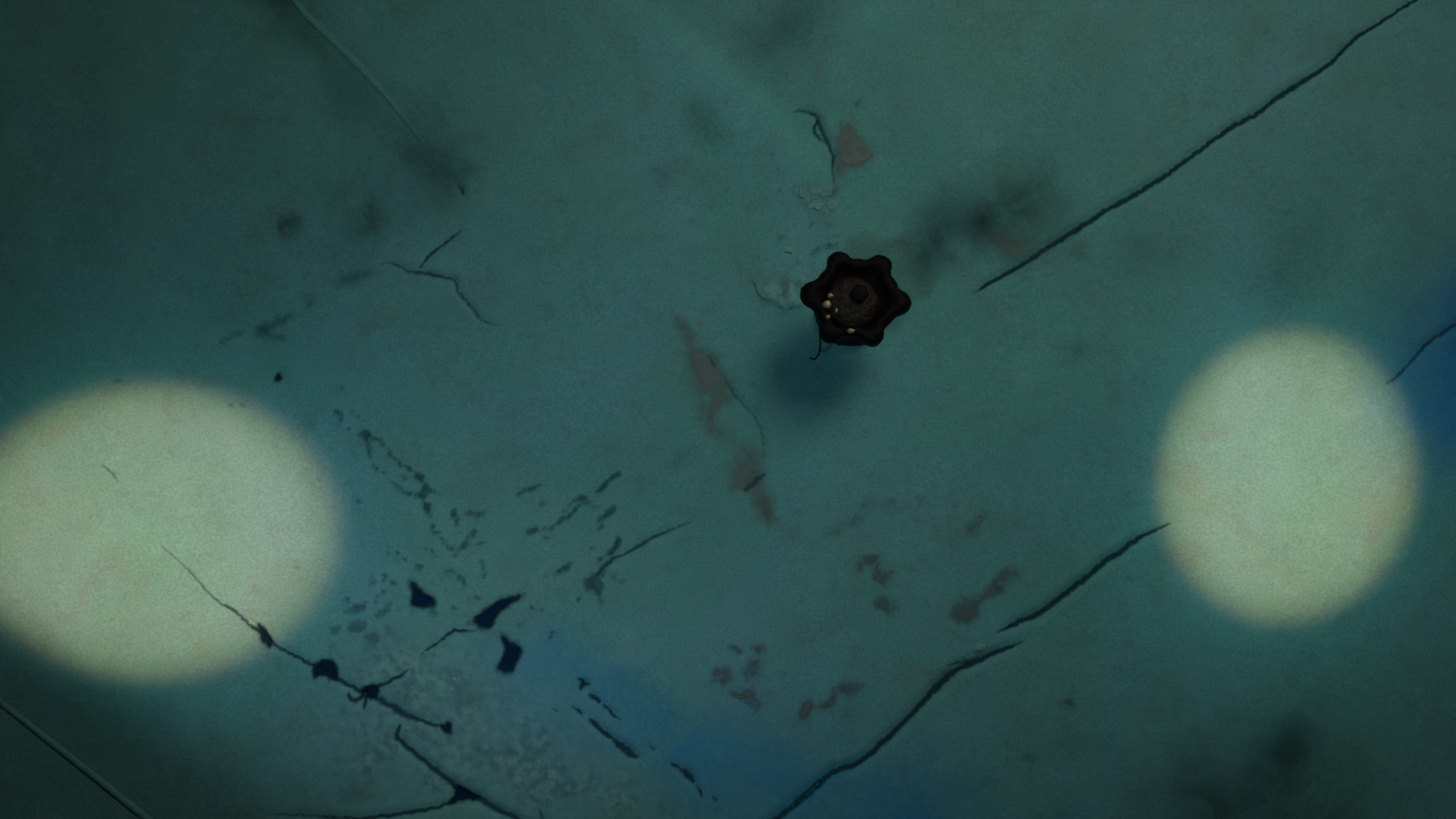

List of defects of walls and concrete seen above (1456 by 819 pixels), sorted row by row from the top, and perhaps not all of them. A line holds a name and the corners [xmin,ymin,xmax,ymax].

crack [800,110,835,166]
crack [979,0,1417,290]
crack [397,236,478,315]
crack [1393,323,1456,380]
spalling [395,458,476,548]
crack [597,532,666,575]
crack [223,604,521,819]
crack [575,678,718,801]
crack [773,524,1168,819]